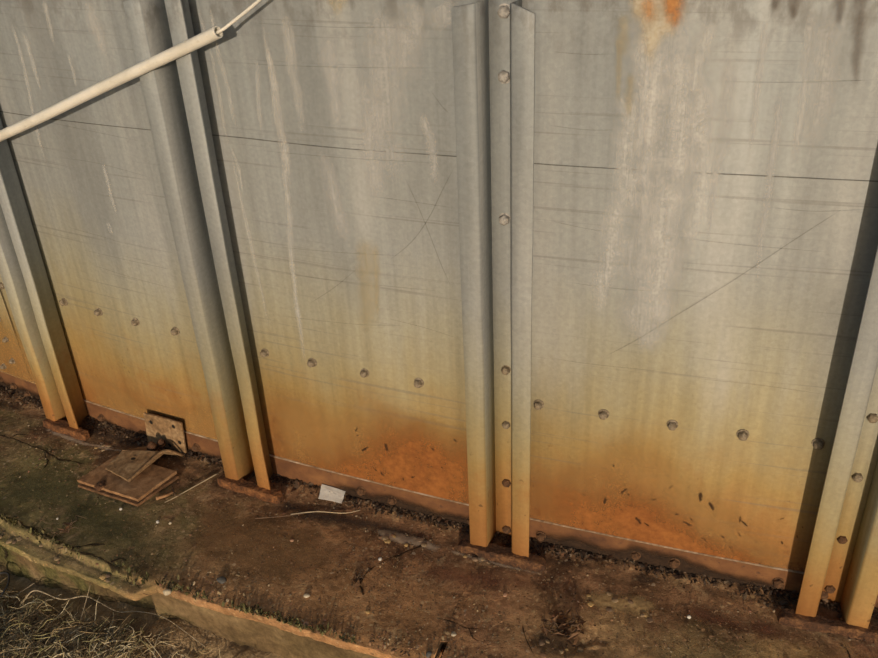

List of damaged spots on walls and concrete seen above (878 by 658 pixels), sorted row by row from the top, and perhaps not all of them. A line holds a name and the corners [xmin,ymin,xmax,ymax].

corrosion [634,0,680,49]
leakage [630,30,703,339]
corrosion [42,418,90,441]
corrosion [285,413,468,503]
corrosion [550,453,765,565]
corrosion [458,539,546,572]
corrosion [778,608,878,644]